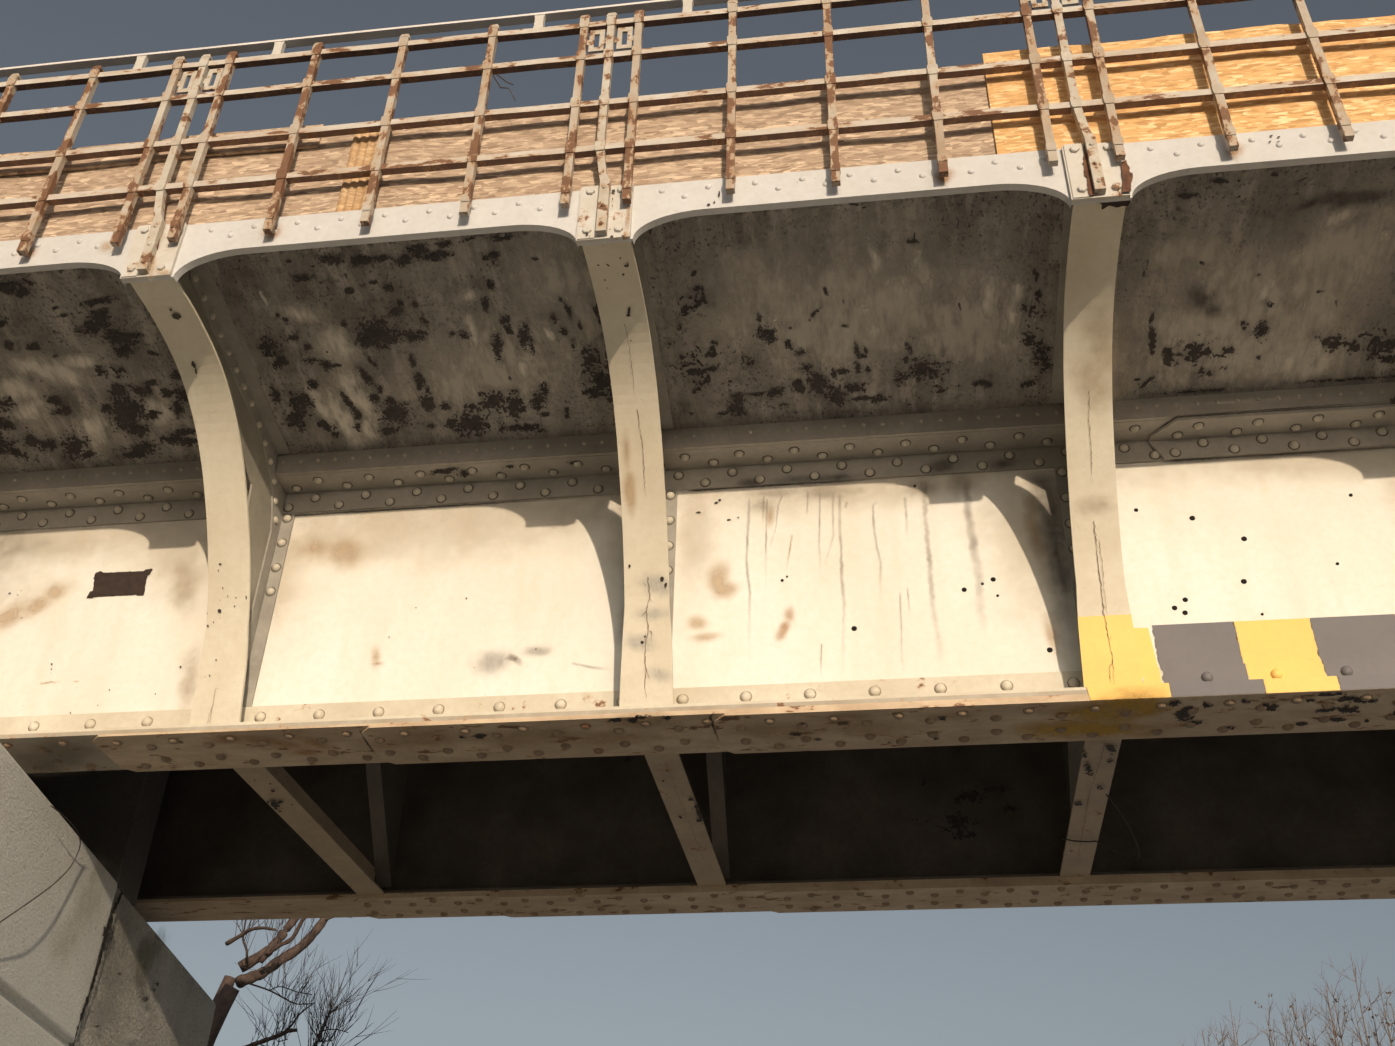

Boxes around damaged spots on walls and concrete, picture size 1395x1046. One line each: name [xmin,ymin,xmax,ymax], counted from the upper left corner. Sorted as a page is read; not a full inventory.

corrosion [1083,144,1098,195]
corrosion [1121,160,1133,192]
damp [0,355,96,420]
damp [259,291,383,448]
damp [430,289,572,415]
damp [714,244,1034,369]
damp [1122,207,1395,388]
peeling [87,569,152,598]
crack [642,577,653,698]
crack [1094,524,1115,684]
peeling [1169,700,1214,725]
peeling [1296,693,1378,726]